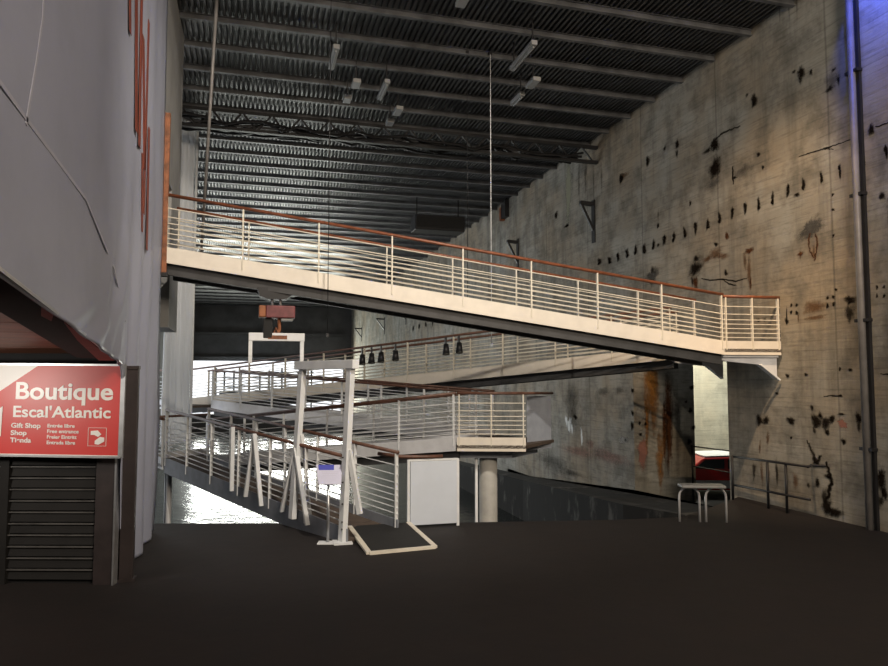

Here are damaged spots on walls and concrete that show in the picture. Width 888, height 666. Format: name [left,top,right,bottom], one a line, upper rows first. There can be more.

crack [799,122,888,157]
rust [645,371,673,485]